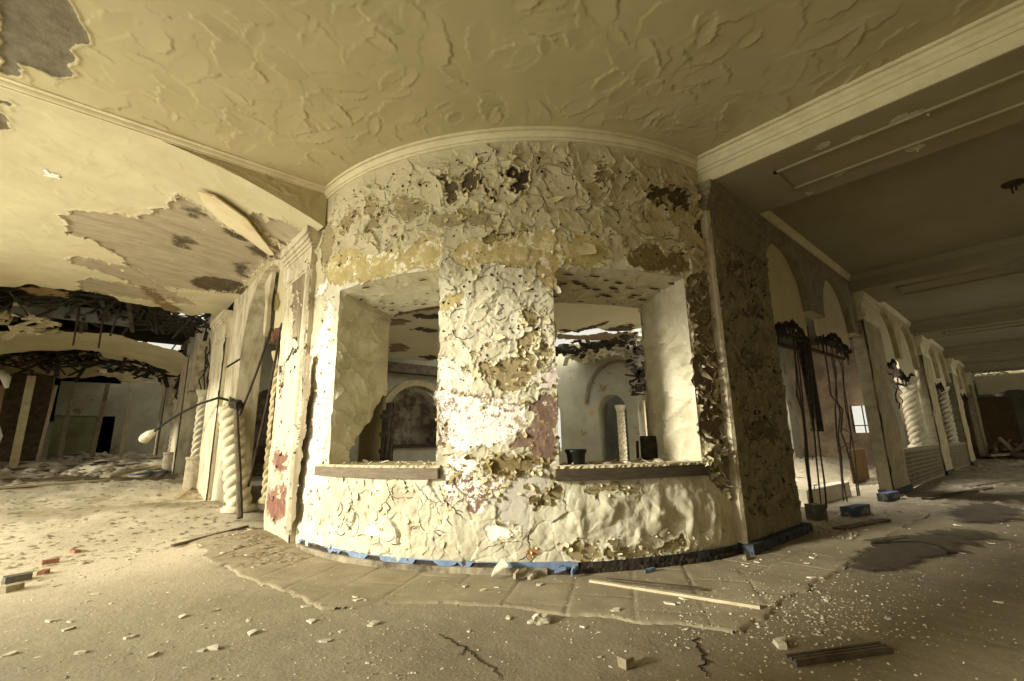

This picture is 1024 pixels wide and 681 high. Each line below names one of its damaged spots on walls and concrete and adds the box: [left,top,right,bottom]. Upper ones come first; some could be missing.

flaking render [269,144,860,555]
rust [266,449,288,524]
peeling [555,526,726,577]
water stain [845,503,1024,570]
crack [438,633,500,679]
crack [691,637,712,677]